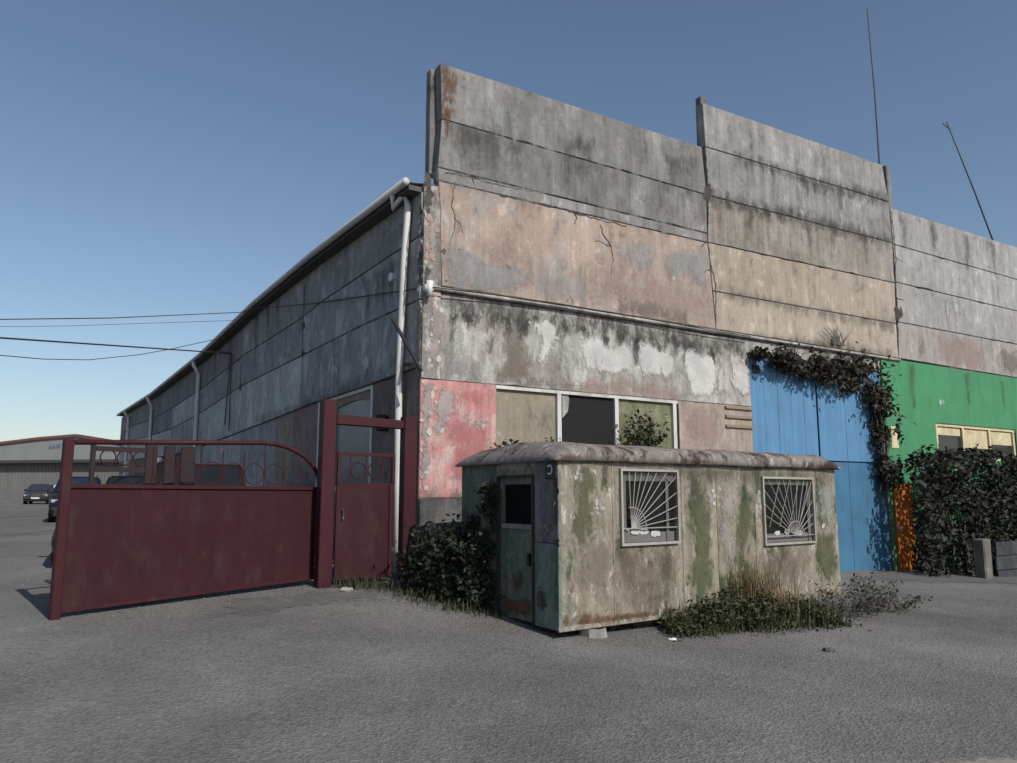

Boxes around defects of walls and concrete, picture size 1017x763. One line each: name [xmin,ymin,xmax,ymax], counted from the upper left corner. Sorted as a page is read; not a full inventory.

crack [445,172,626,273]
crack [696,149,717,325]
leakage [451,299,739,365]
rust [553,455,572,524]
rust [502,562,702,626]